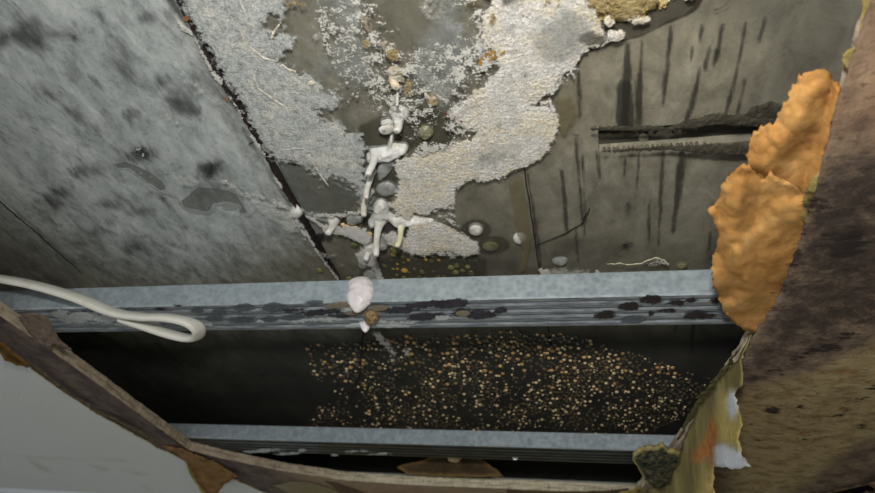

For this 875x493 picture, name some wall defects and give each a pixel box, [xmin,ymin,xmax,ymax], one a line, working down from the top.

water stain [0,24,41,46]
water stain [684,24,723,123]
water stain [115,0,701,279]
mould [802,191,830,213]